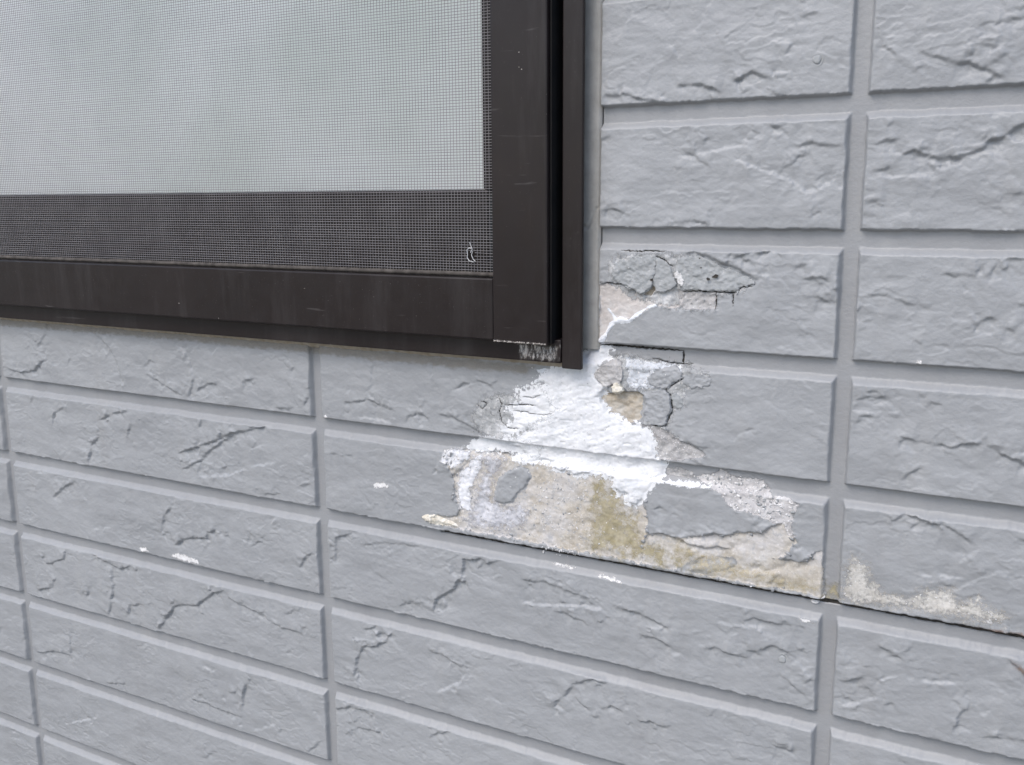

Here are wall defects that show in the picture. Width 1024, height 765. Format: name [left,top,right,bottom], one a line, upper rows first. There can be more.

peeling [599,251,755,338]
spalling [438,352,827,597]